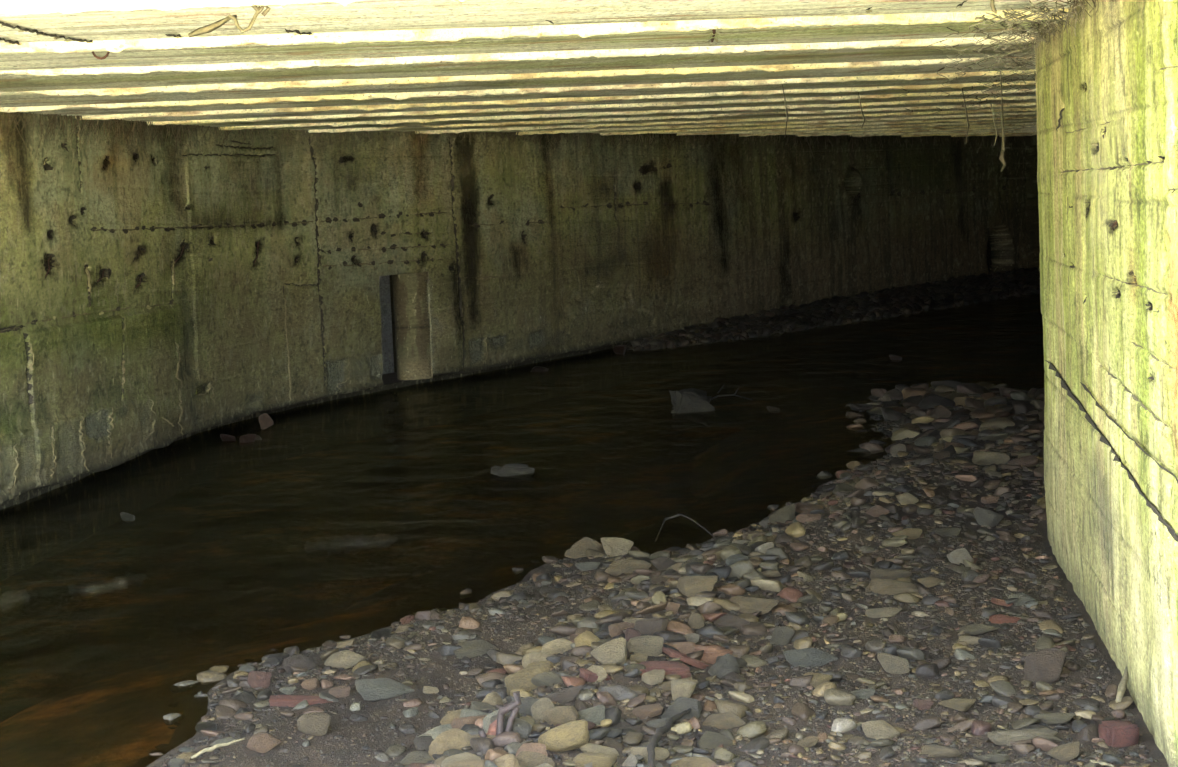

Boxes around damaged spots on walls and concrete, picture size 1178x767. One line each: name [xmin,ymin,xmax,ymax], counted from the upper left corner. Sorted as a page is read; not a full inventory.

leakage [0,0,362,15]
leakage [0,9,1068,337]
crack [0,127,711,412]
crack [1131,342,1175,369]
crack [1045,360,1178,542]